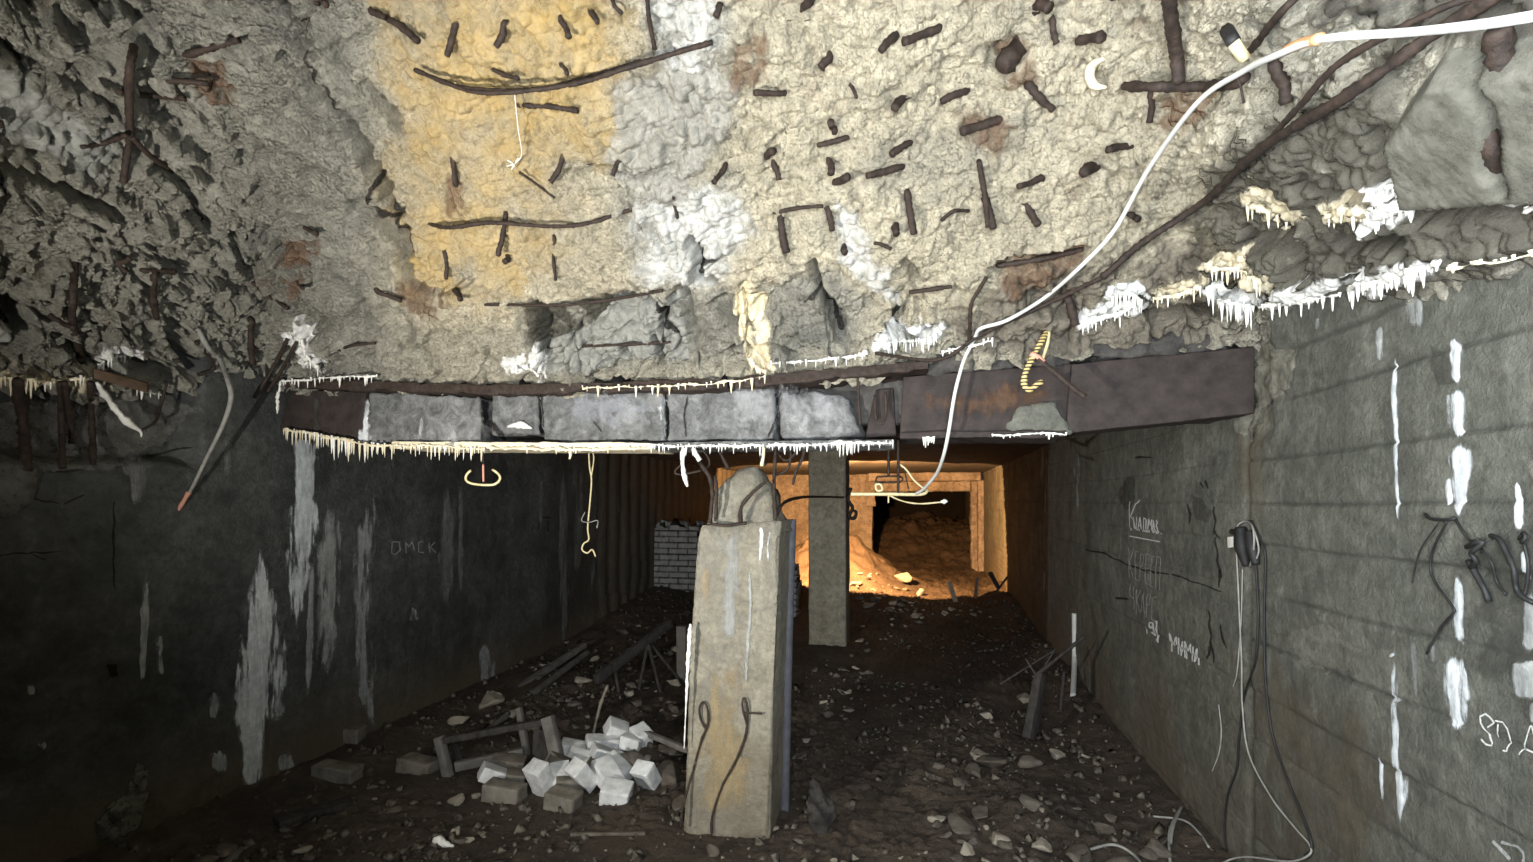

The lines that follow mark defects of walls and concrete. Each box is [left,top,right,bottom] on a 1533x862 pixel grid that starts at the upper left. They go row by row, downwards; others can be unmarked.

peeling [0,43,187,185]
damp [397,0,616,298]
spalling [413,0,740,230]
spalling [773,204,823,214]
damp [582,0,1533,410]
spalling [875,0,1517,363]
spalling [0,261,203,472]
spalling [484,285,691,375]
damp [1375,327,1401,515]
damp [1445,339,1472,515]
damp [235,314,894,785]
damp [1378,547,1533,817]